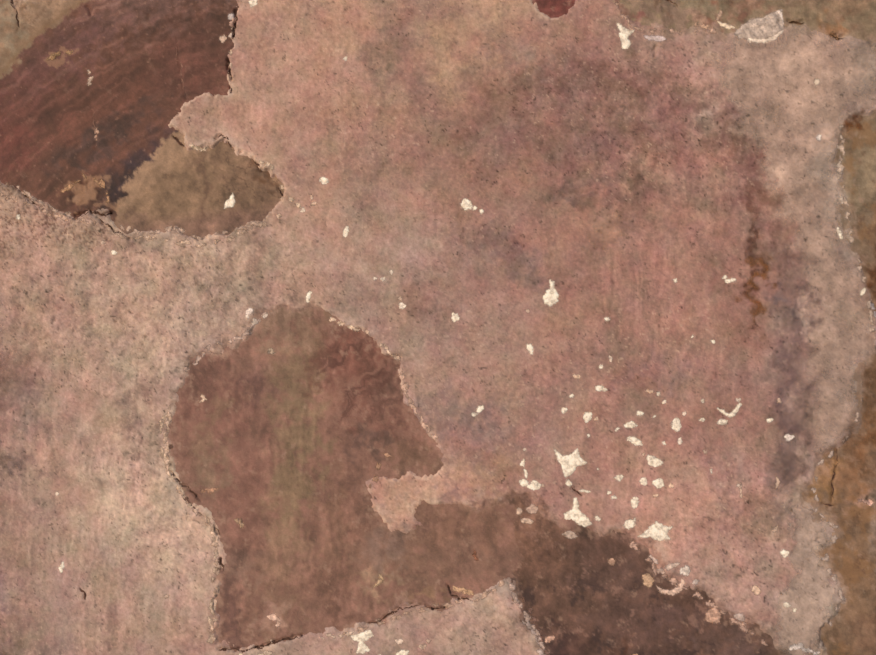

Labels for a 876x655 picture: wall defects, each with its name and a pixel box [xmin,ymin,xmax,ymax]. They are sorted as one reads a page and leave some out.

spalling [0,0,316,248]
spalling [532,0,575,18]
spalling [613,0,876,52]
spalling [834,112,876,332]
spalling [159,306,876,655]